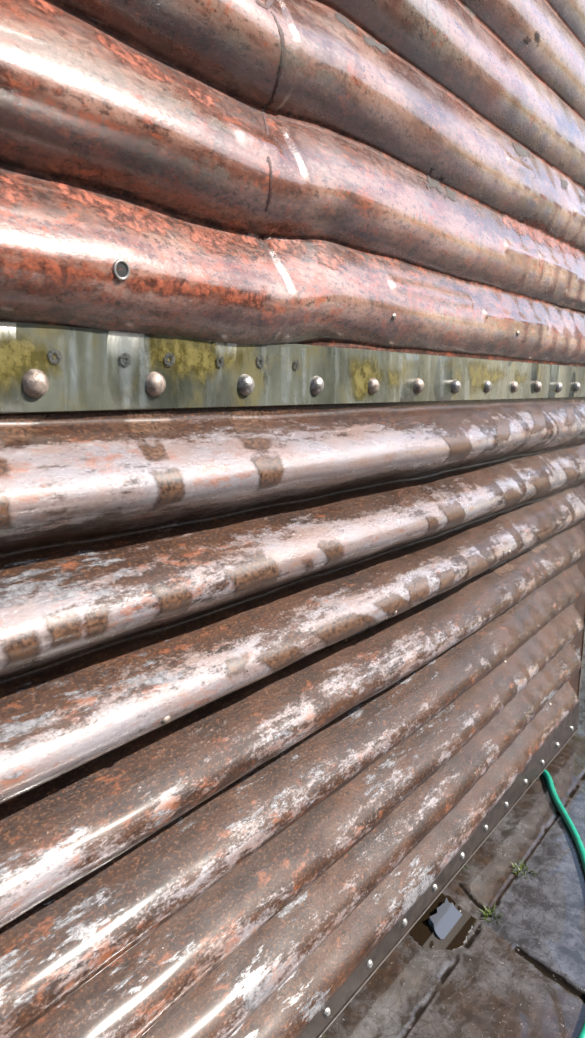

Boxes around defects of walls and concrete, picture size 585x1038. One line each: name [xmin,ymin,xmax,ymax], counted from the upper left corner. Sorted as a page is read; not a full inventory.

crack [256,0,285,212]
rust [53,181,172,235]
rust [190,222,344,269]
rust [0,248,271,308]
rust [125,411,185,509]
peeling [0,546,140,608]
rust [225,527,553,678]
rust [3,607,109,669]
peeling [0,710,55,750]
peeling [374,855,440,915]
peeling [0,888,124,1004]
peeling [226,946,330,1038]